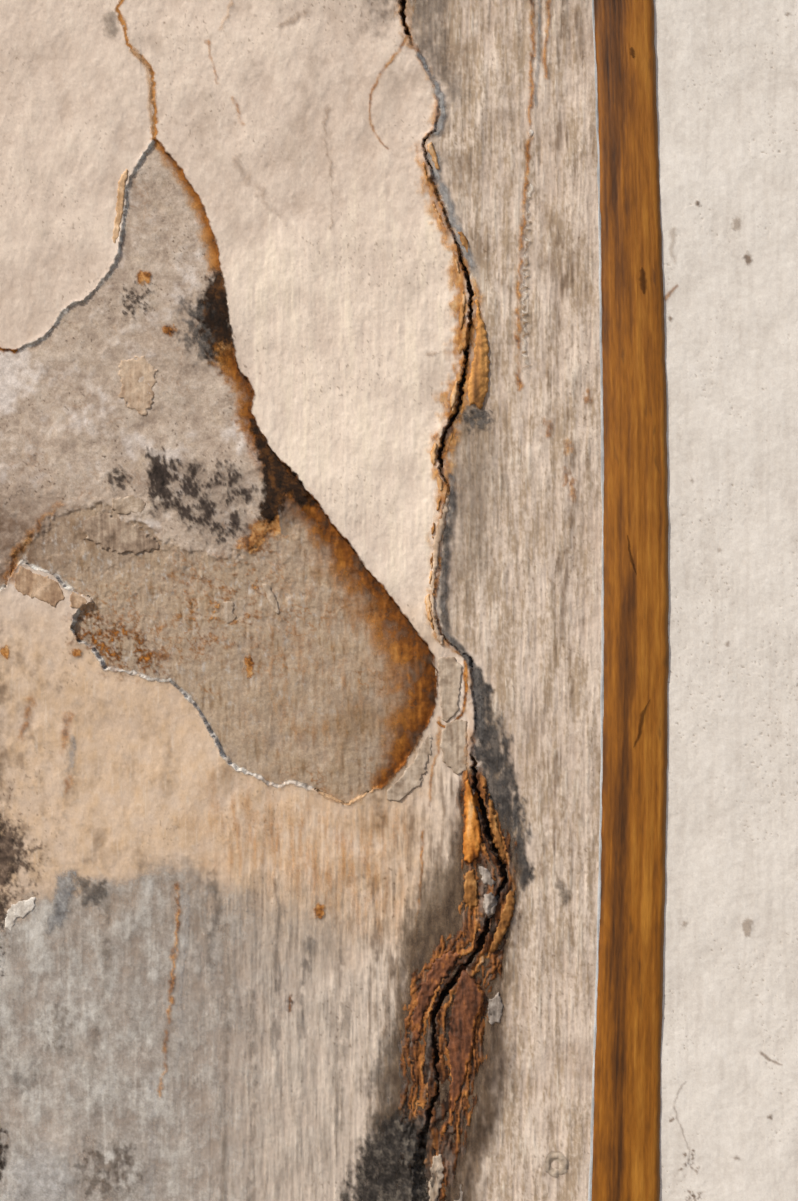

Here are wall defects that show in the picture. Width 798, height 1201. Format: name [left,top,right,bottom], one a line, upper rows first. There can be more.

crack [115,0,158,140]
flaking render [0,141,421,805]
water stain [145,419,317,544]
crack [369,0,508,1197]
water stain [0,814,233,1201]
water stain [340,667,534,1201]